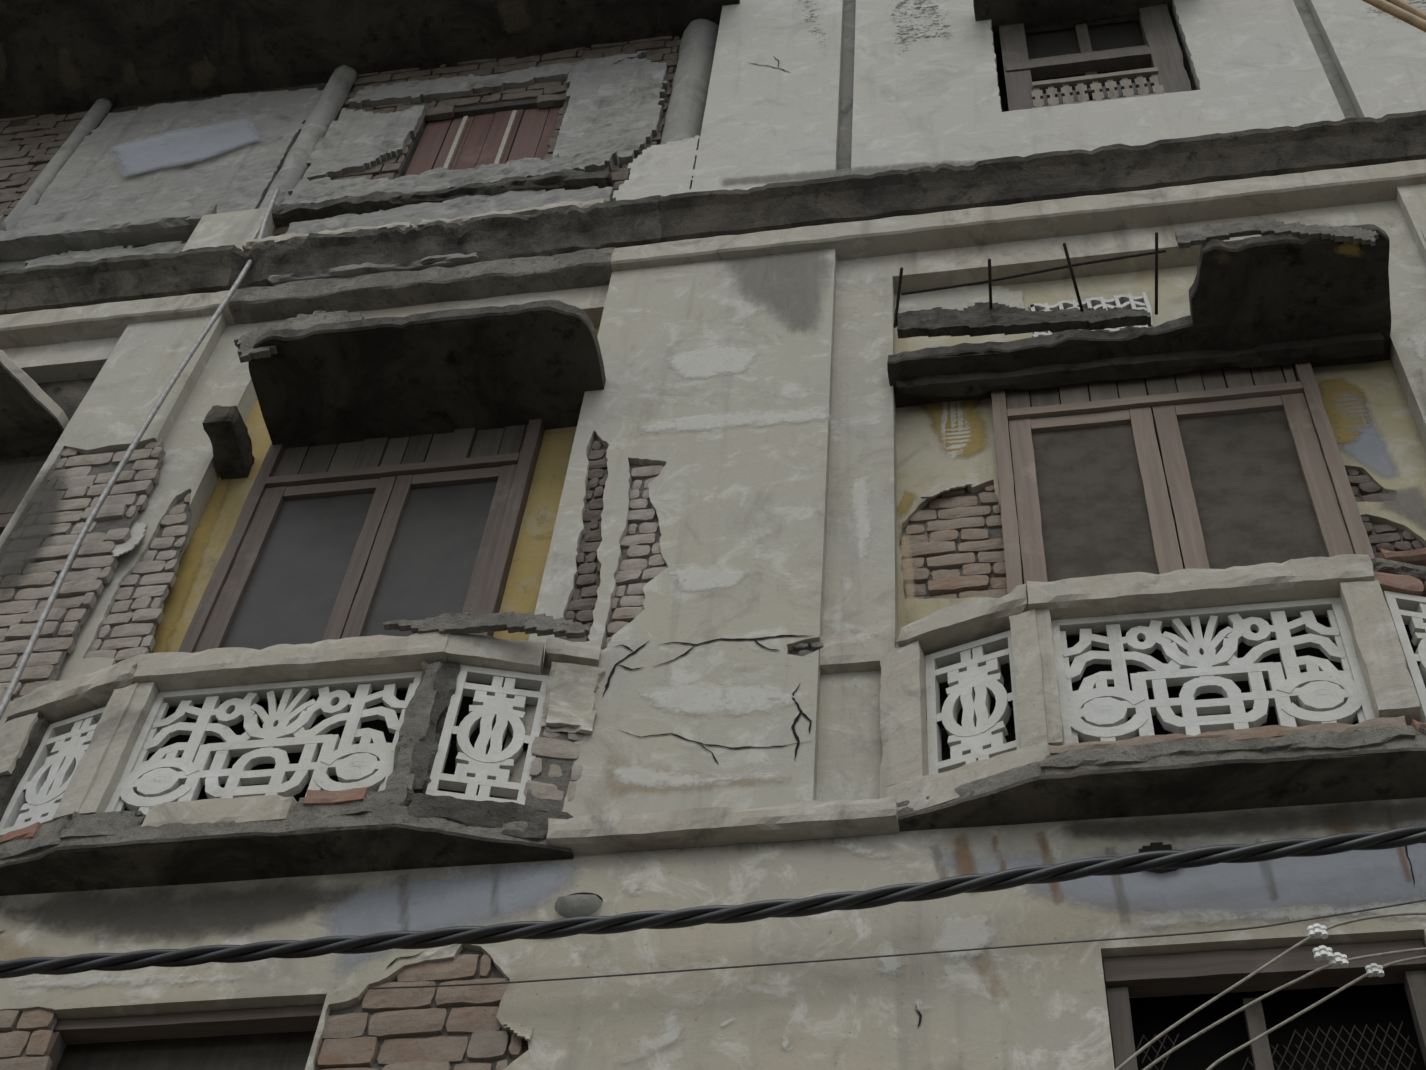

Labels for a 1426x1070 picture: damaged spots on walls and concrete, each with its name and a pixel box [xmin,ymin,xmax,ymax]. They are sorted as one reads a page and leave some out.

peeling [941,401,971,458]
spalling [0,438,192,702]
spalling [560,436,668,649]
spalling [899,477,1007,599]
peeling [1333,394,1426,597]
crack [603,635,806,695]
crack [618,684,812,763]
spalling [0,1008,58,1070]
spalling [316,949,533,1070]